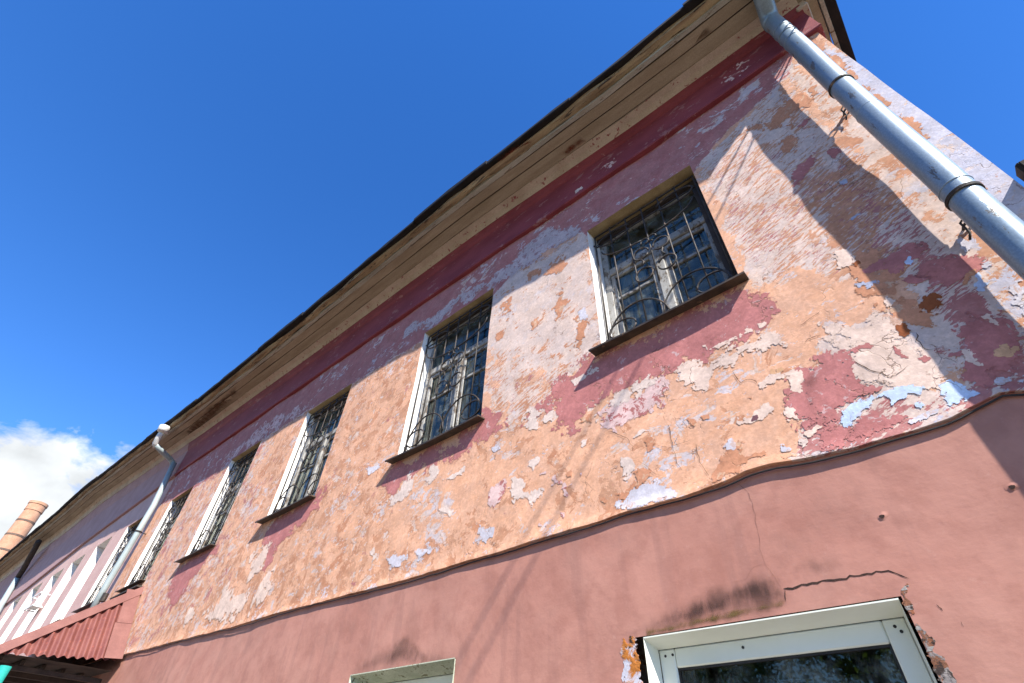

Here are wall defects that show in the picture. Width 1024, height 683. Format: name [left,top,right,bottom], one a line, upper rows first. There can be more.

peeling [808,37,892,106]
peeling [744,84,819,153]
peeling [899,113,931,139]
peeling [791,148,841,187]
peeling [736,238,1024,452]
peeling [366,286,788,509]
peeling [370,545,432,570]
peeling [473,525,495,545]
crack [738,484,907,601]
spalling [620,636,643,683]
spalling [901,583,957,683]